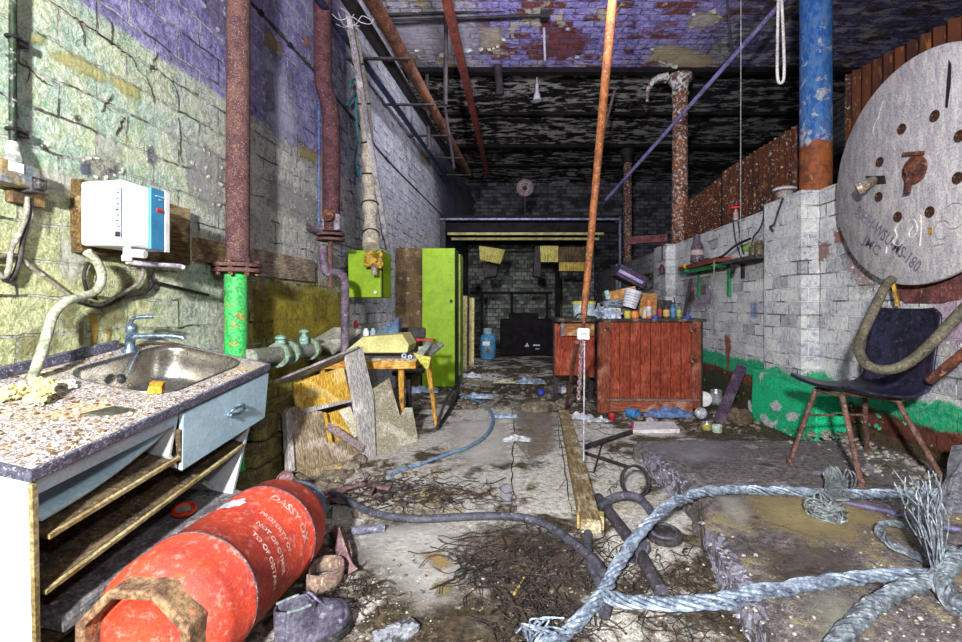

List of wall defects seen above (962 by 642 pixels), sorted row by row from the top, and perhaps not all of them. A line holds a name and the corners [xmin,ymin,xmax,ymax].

peeling [687,9,724,28]
crack [22,58,52,86]
crack [49,0,194,162]
spalling [541,26,587,60]
peeling [650,44,716,69]
crack [500,393,528,512]